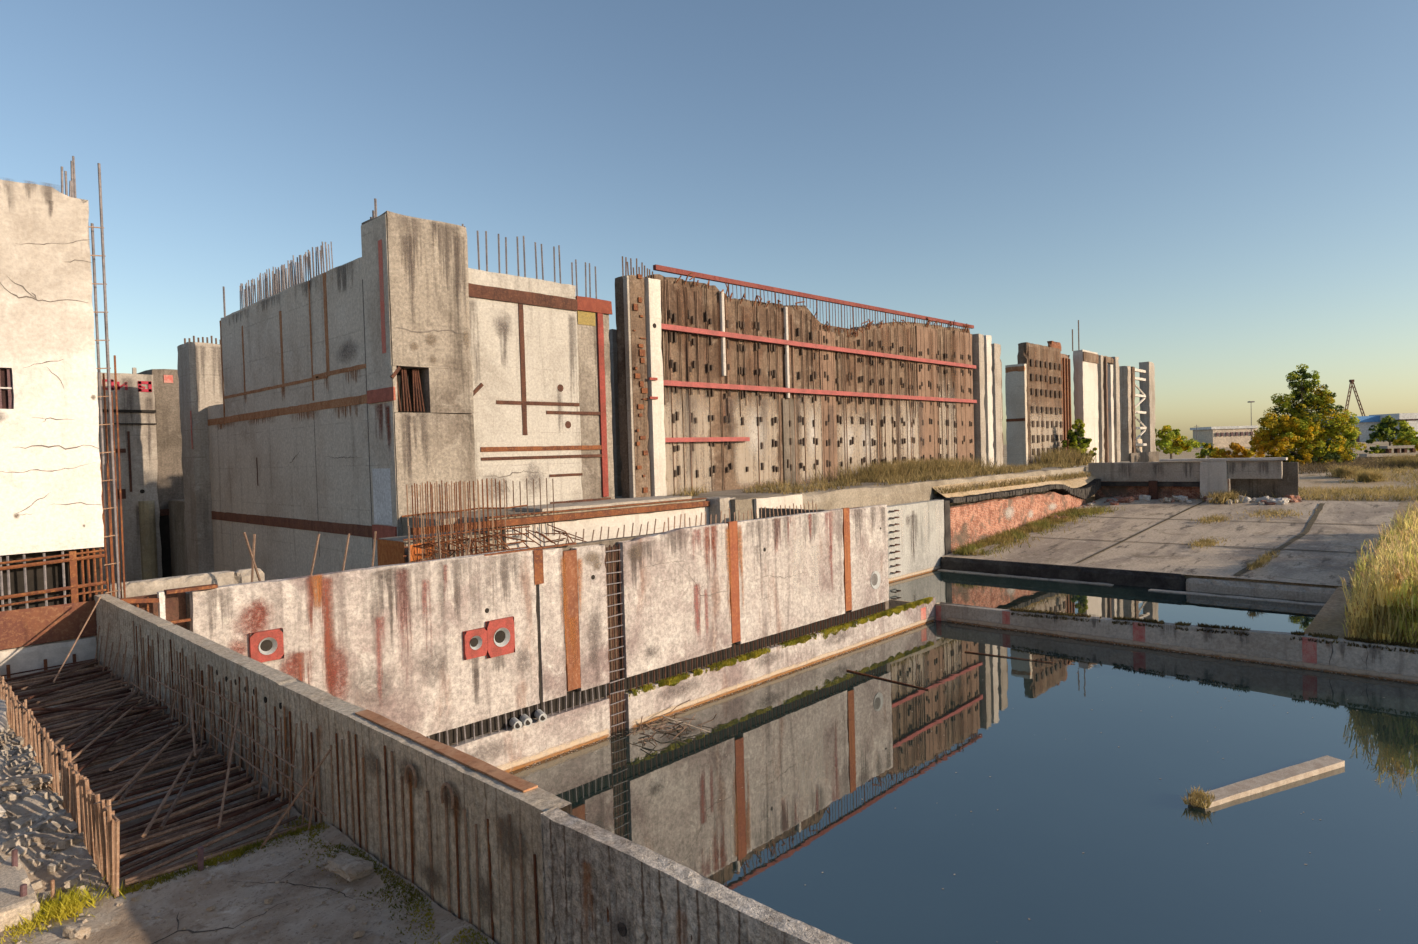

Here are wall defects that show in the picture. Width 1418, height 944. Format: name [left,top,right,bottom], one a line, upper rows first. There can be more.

crack [0,239,92,303]
crack [0,359,100,515]
corrosion [695,526,743,600]
corrosion [231,603,267,655]
corrosion [282,575,348,696]
corrosion [694,585,708,633]